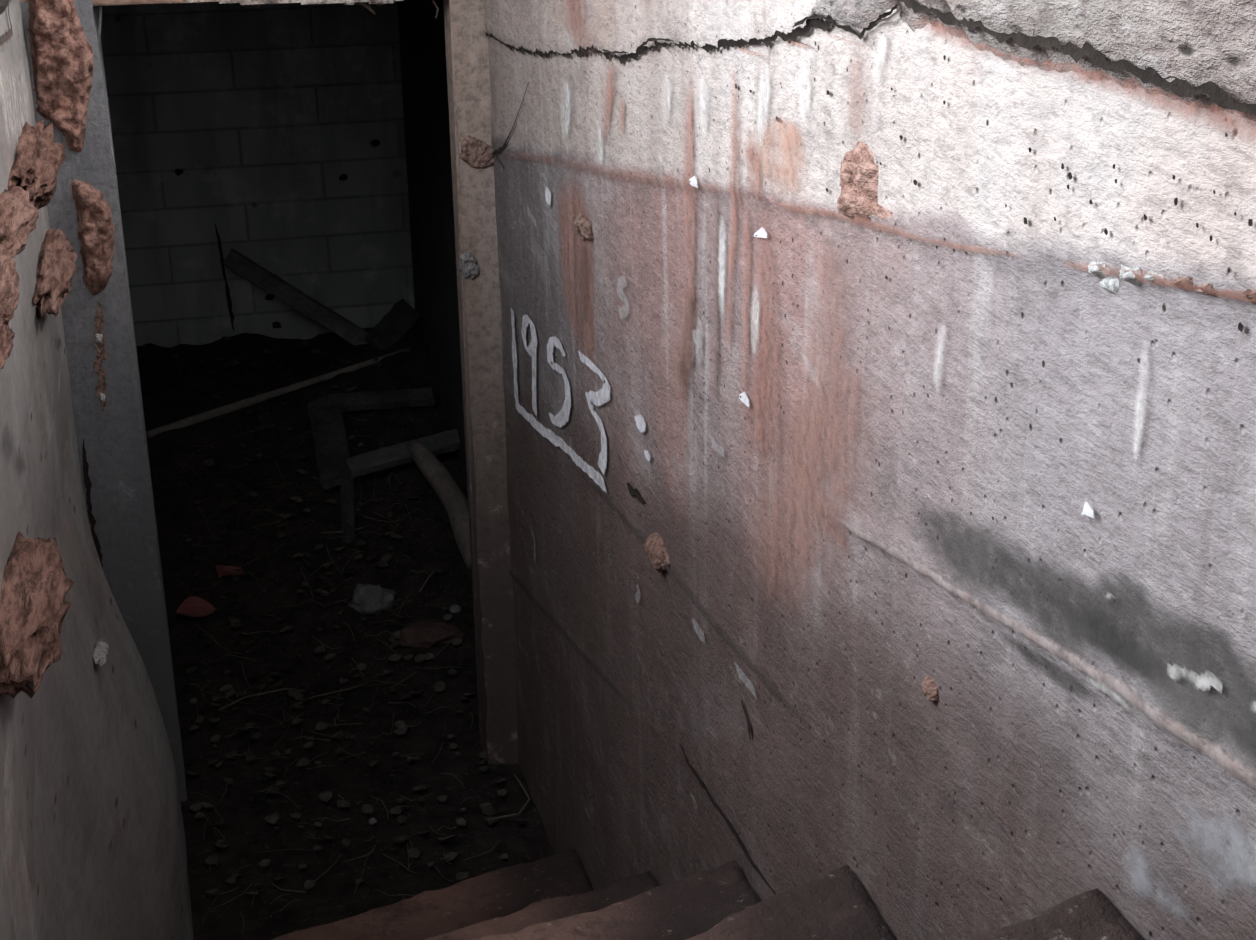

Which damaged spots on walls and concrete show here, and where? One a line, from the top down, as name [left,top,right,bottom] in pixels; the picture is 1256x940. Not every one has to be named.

crack [483,0,1256,168]
rust [714,120,799,448]
rust [1133,273,1256,302]
water stain [930,515,1256,765]